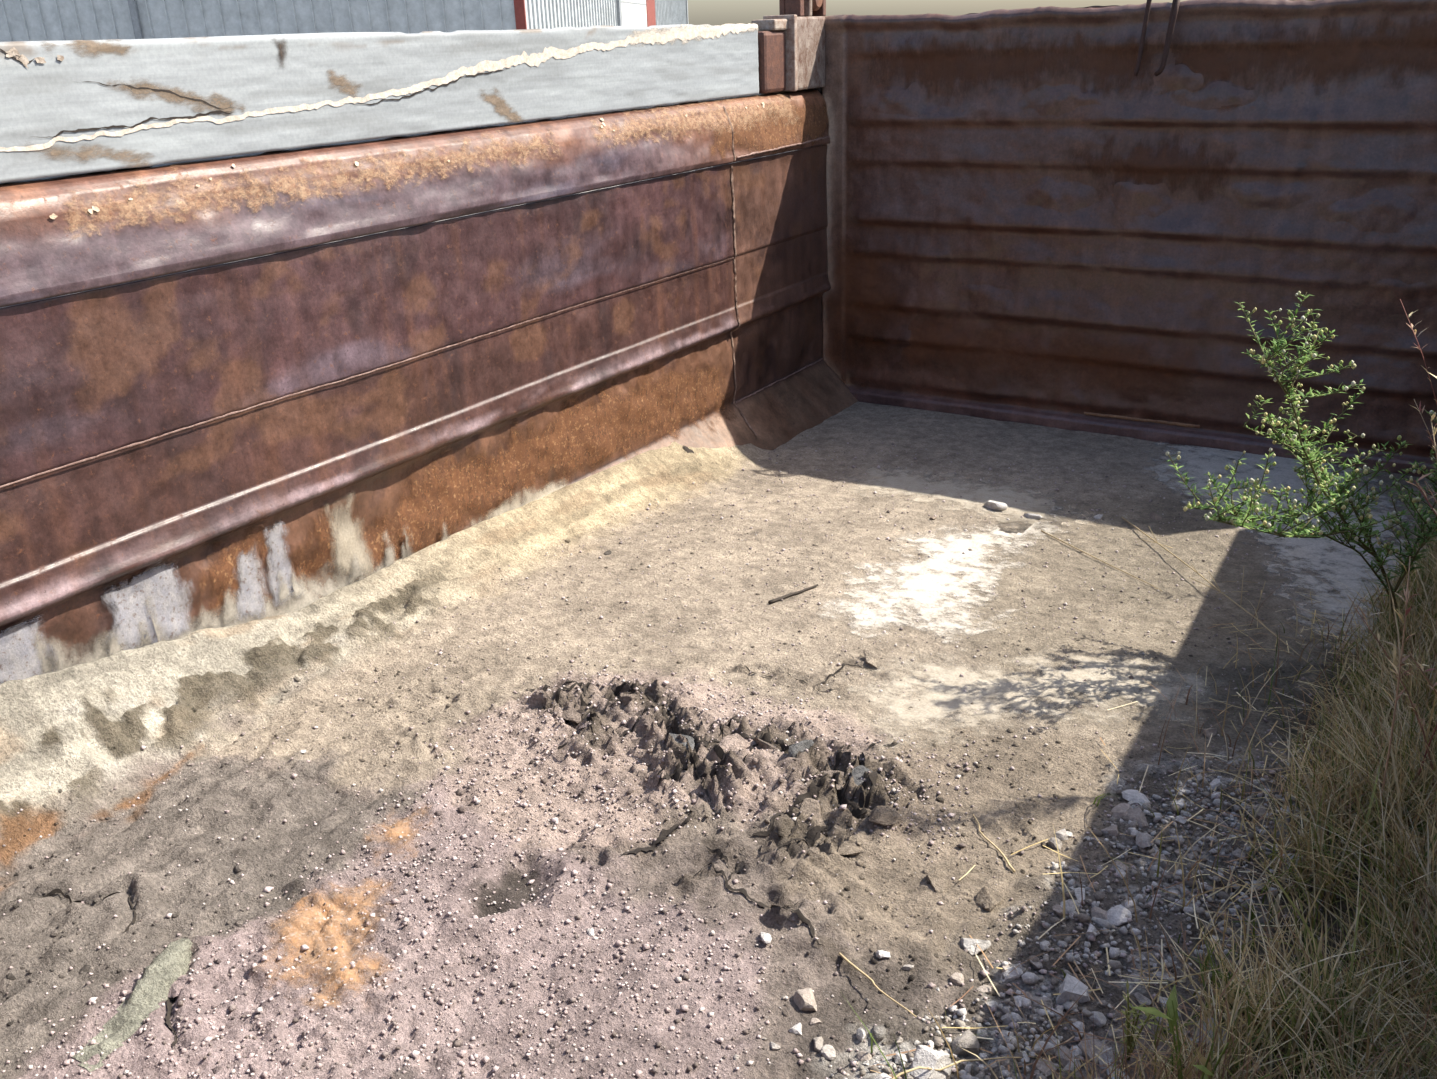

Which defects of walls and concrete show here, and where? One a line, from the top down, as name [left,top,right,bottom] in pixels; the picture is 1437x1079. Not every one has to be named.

crack [0,24,758,152]
rust [711,100,829,158]
rust [1076,138,1233,194]
rust [291,367,730,598]
rust [202,519,272,619]
crack [746,663,881,692]
crack [525,680,797,788]
crack [620,743,898,950]